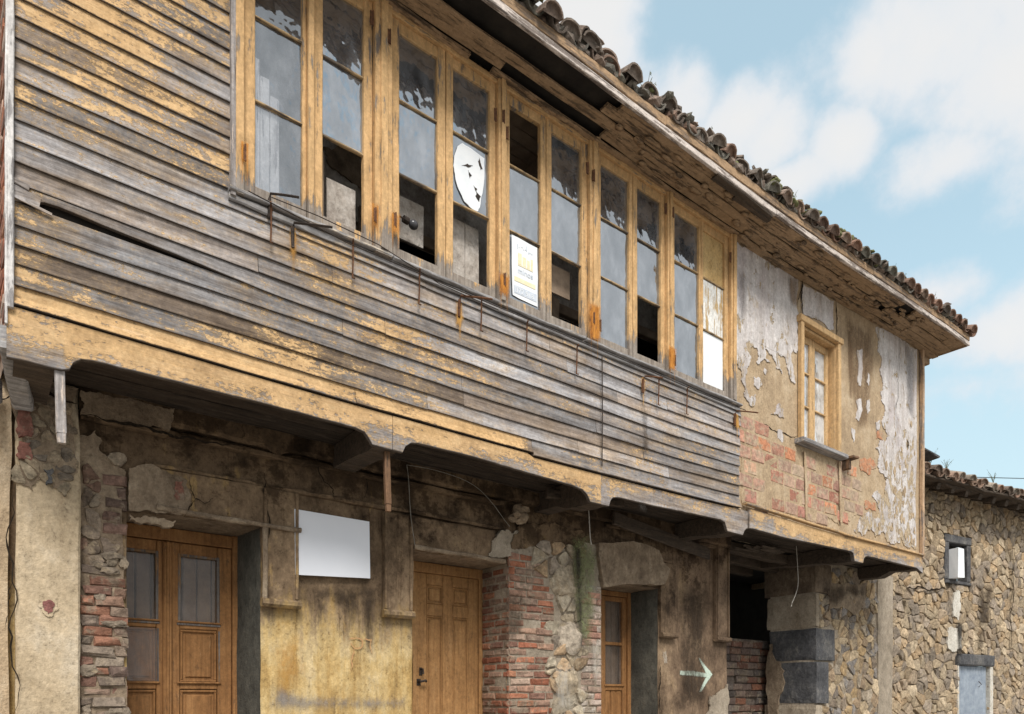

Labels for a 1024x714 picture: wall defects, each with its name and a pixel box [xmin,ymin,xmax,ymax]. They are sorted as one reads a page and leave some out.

corrosion [589,304,600,339]
peeling [737,242,917,550]
flaking render [10,387,191,714]
flaking render [482,522,670,714]